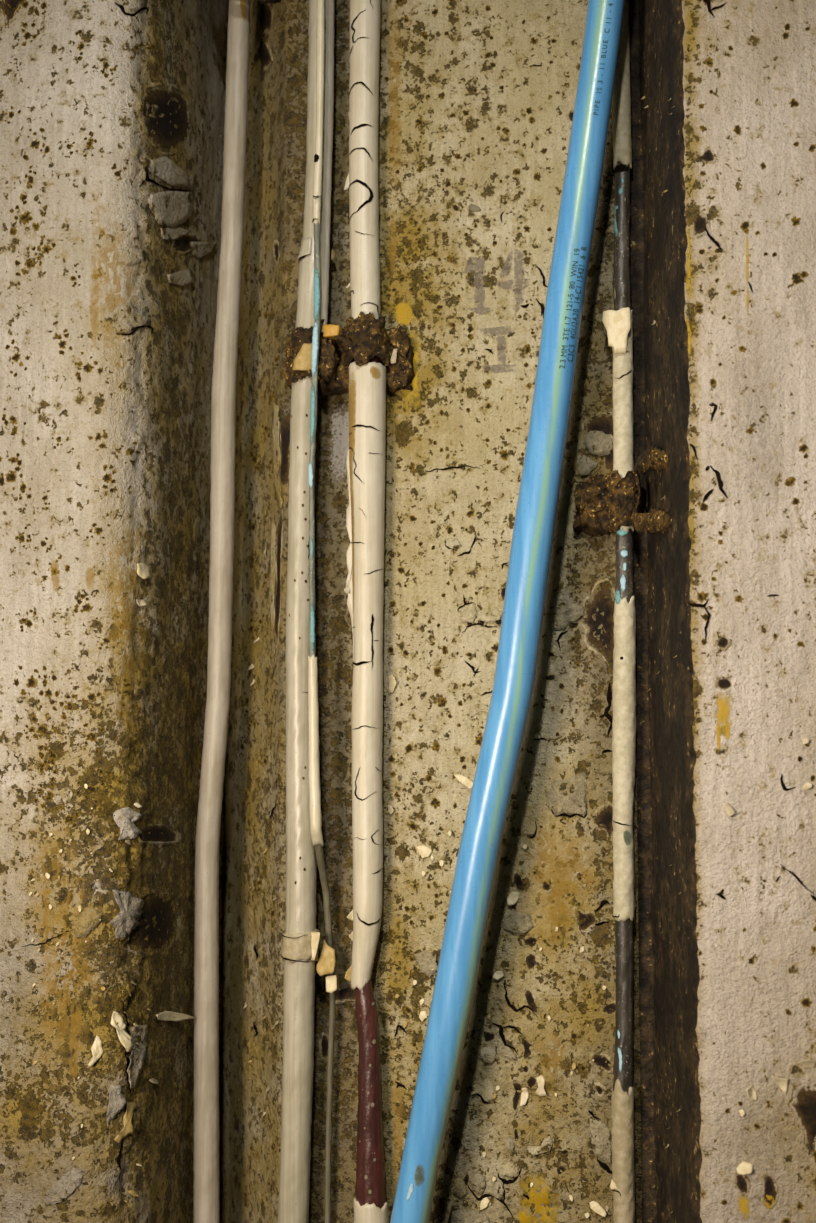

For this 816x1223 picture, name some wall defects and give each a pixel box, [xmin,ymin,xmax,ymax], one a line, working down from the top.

crack [703,0,727,18]
crack [427,464,478,472]
crack [445,534,476,556]
crack [457,595,500,696]
peeling [113,801,182,846]
spalling [99,889,185,955]
peeling [78,1035,103,1079]
peeling [106,1008,195,1150]
peeling [471,1029,571,1176]
peeling [446,1177,504,1223]
water stain [518,1177,558,1223]
peeling [584,1201,609,1218]